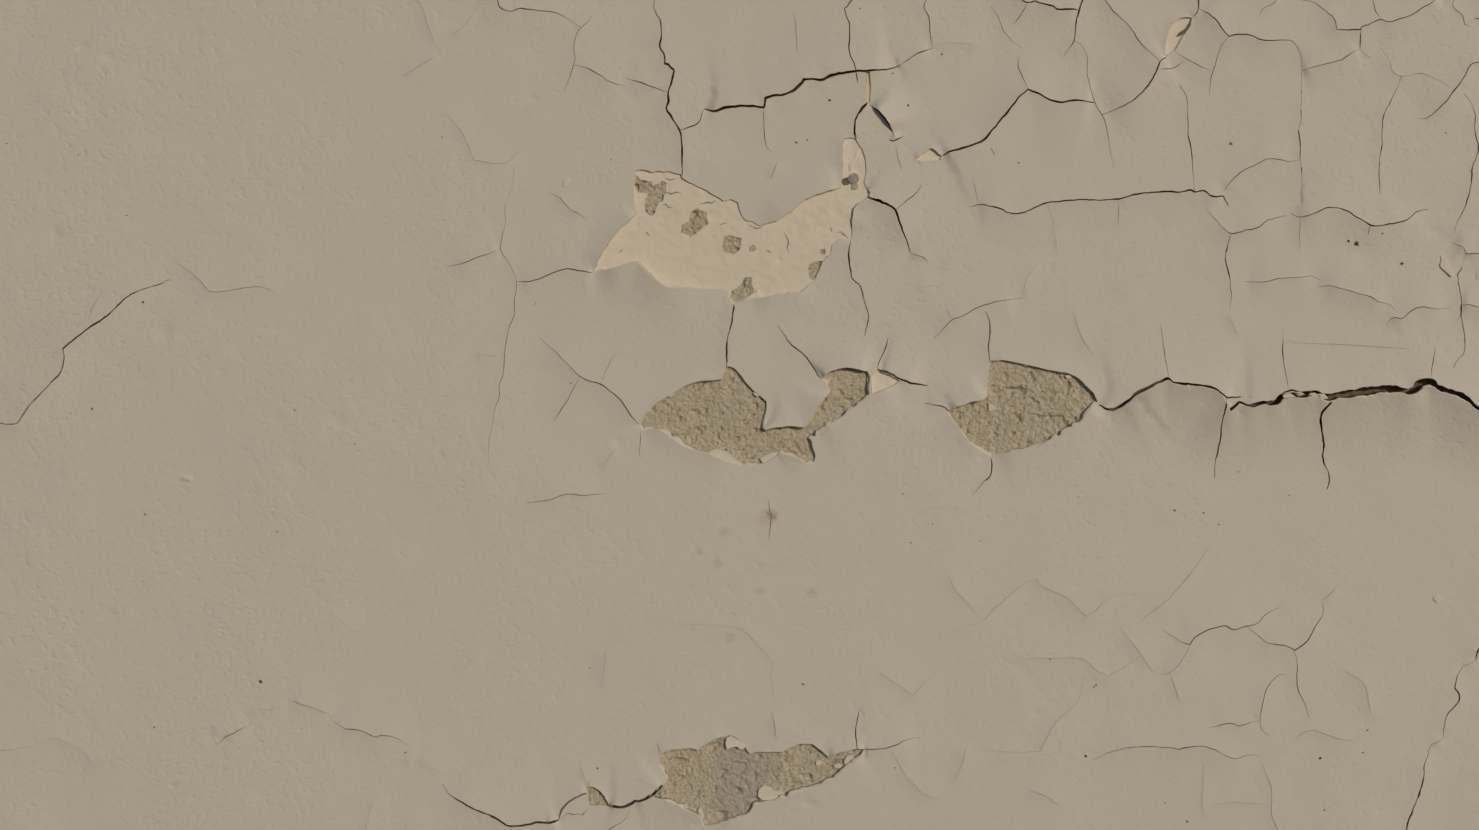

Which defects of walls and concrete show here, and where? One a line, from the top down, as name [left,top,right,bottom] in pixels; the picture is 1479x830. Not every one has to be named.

peeling [593,134,872,307]
crack [405,0,1479,503]
crack [0,262,286,425]
peeling [639,366,901,466]
peeling [946,360,1098,457]
peeling [587,787,613,807]
peeling [649,735,864,827]
crack [855,547,1381,830]
crack [1406,649,1479,830]